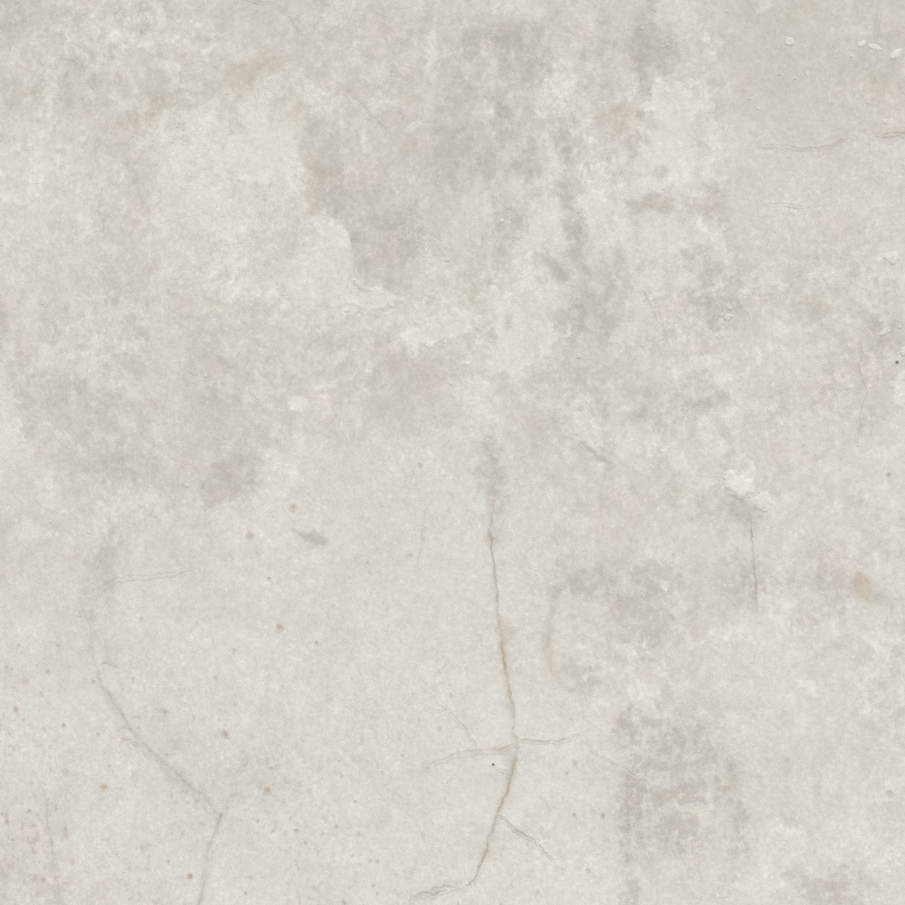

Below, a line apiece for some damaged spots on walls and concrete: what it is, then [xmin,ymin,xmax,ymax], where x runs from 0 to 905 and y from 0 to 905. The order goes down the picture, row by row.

crack [84,566,255,905]
crack [407,491,639,905]